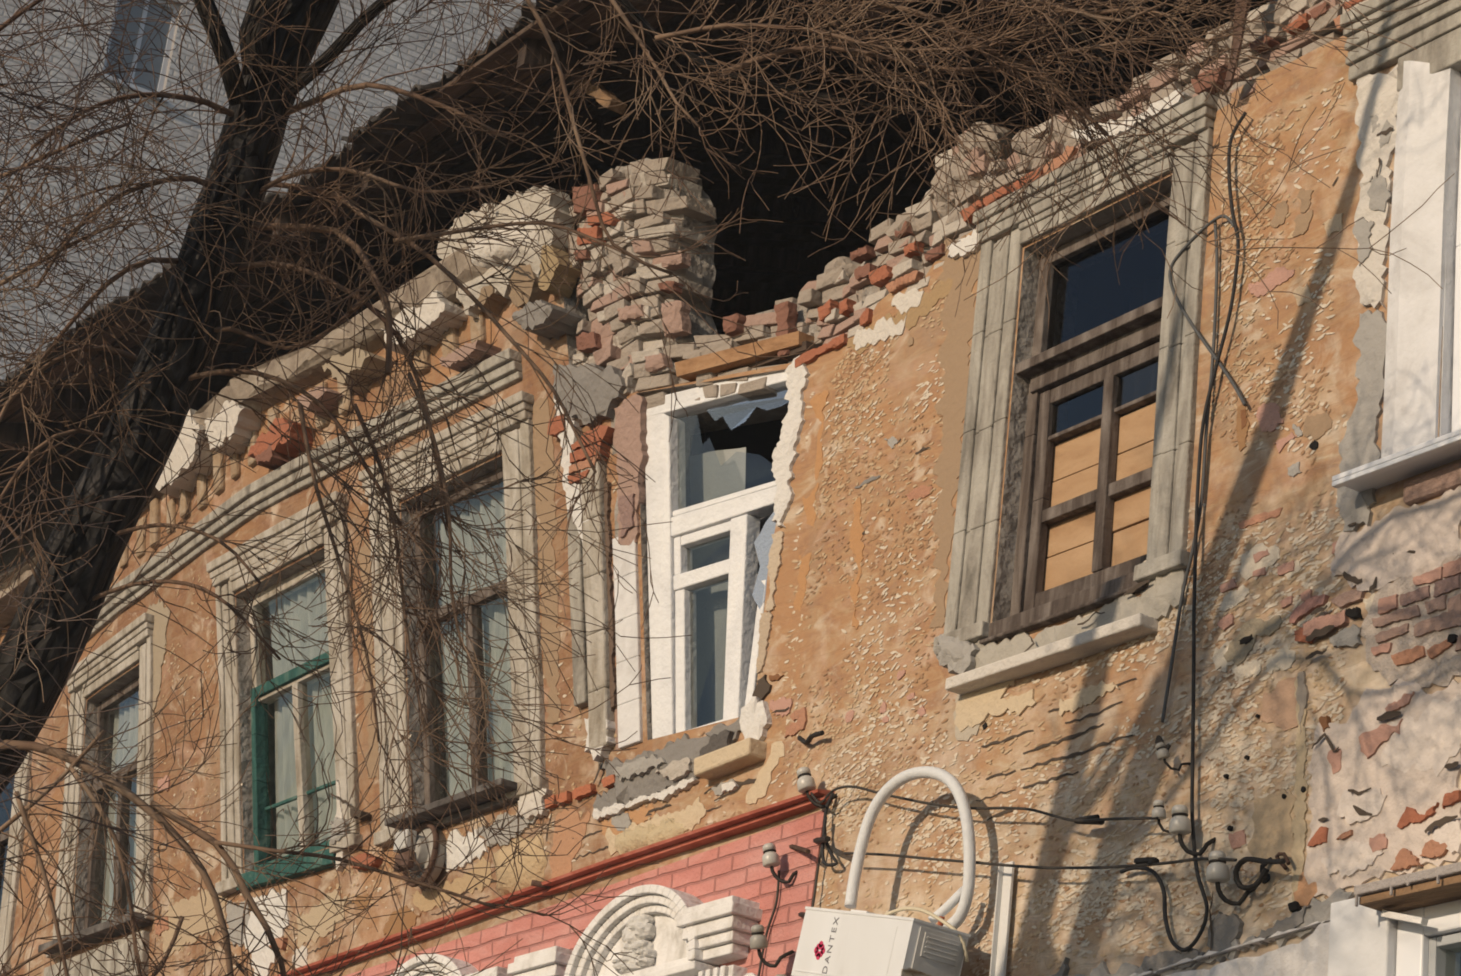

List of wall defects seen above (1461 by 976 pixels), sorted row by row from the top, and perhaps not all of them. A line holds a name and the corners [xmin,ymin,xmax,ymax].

flaking render [1323,64,1399,310]
flaking render [156,385,343,498]
flaking render [381,0,1368,856]
flaking render [1213,486,1461,906]
flaking render [445,829,488,872]